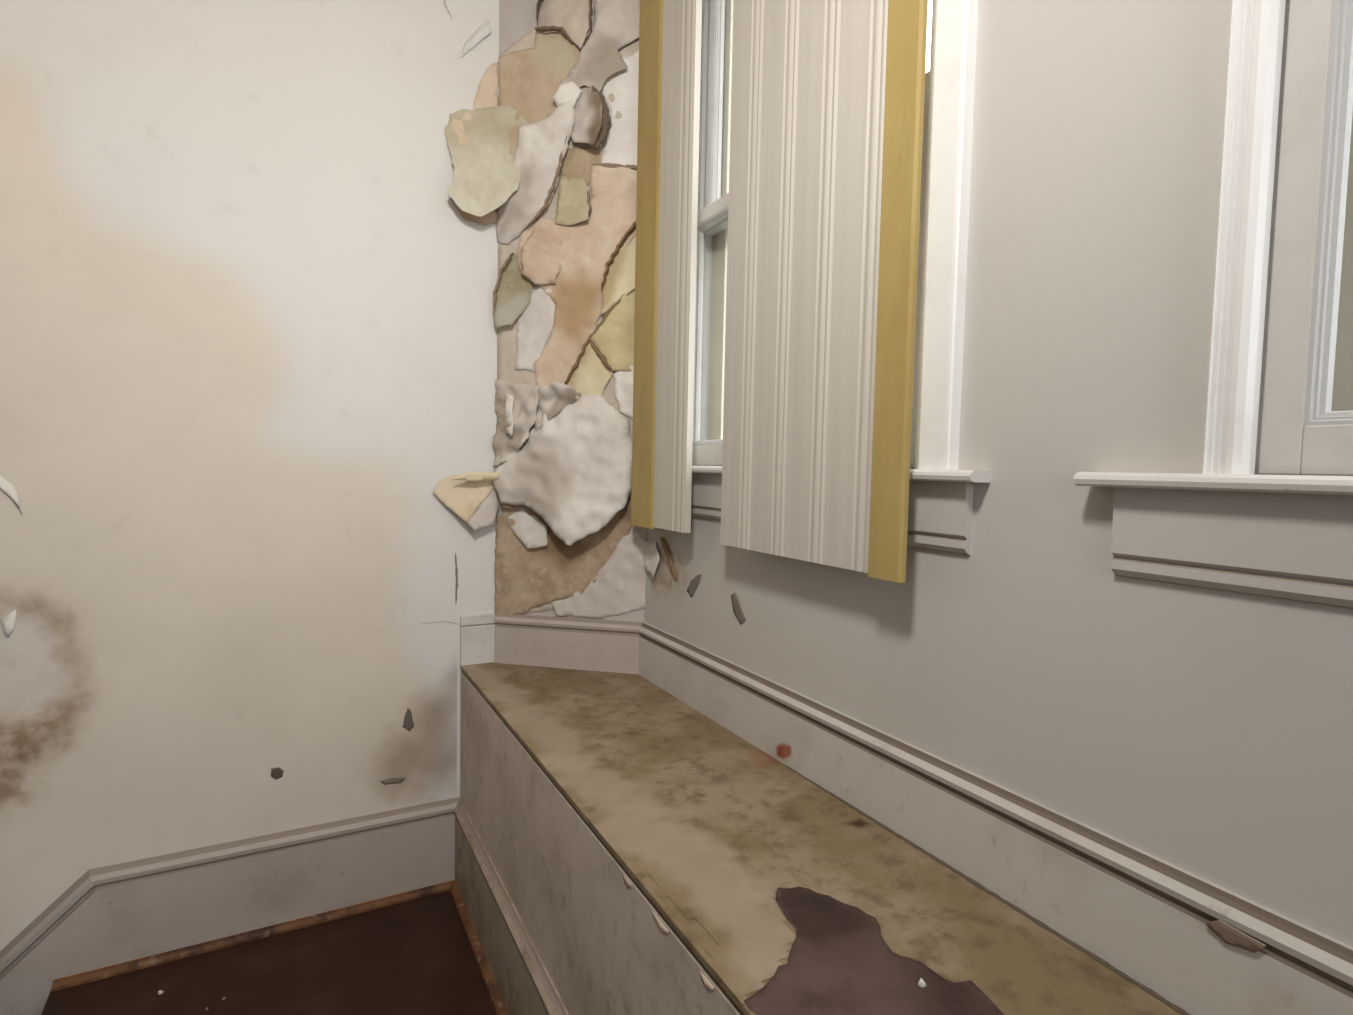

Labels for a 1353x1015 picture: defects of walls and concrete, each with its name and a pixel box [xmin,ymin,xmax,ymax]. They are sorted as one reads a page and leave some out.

peeling [433,0,702,618]
water stain [1,610,16,637]
peeling [744,887,1004,1015]